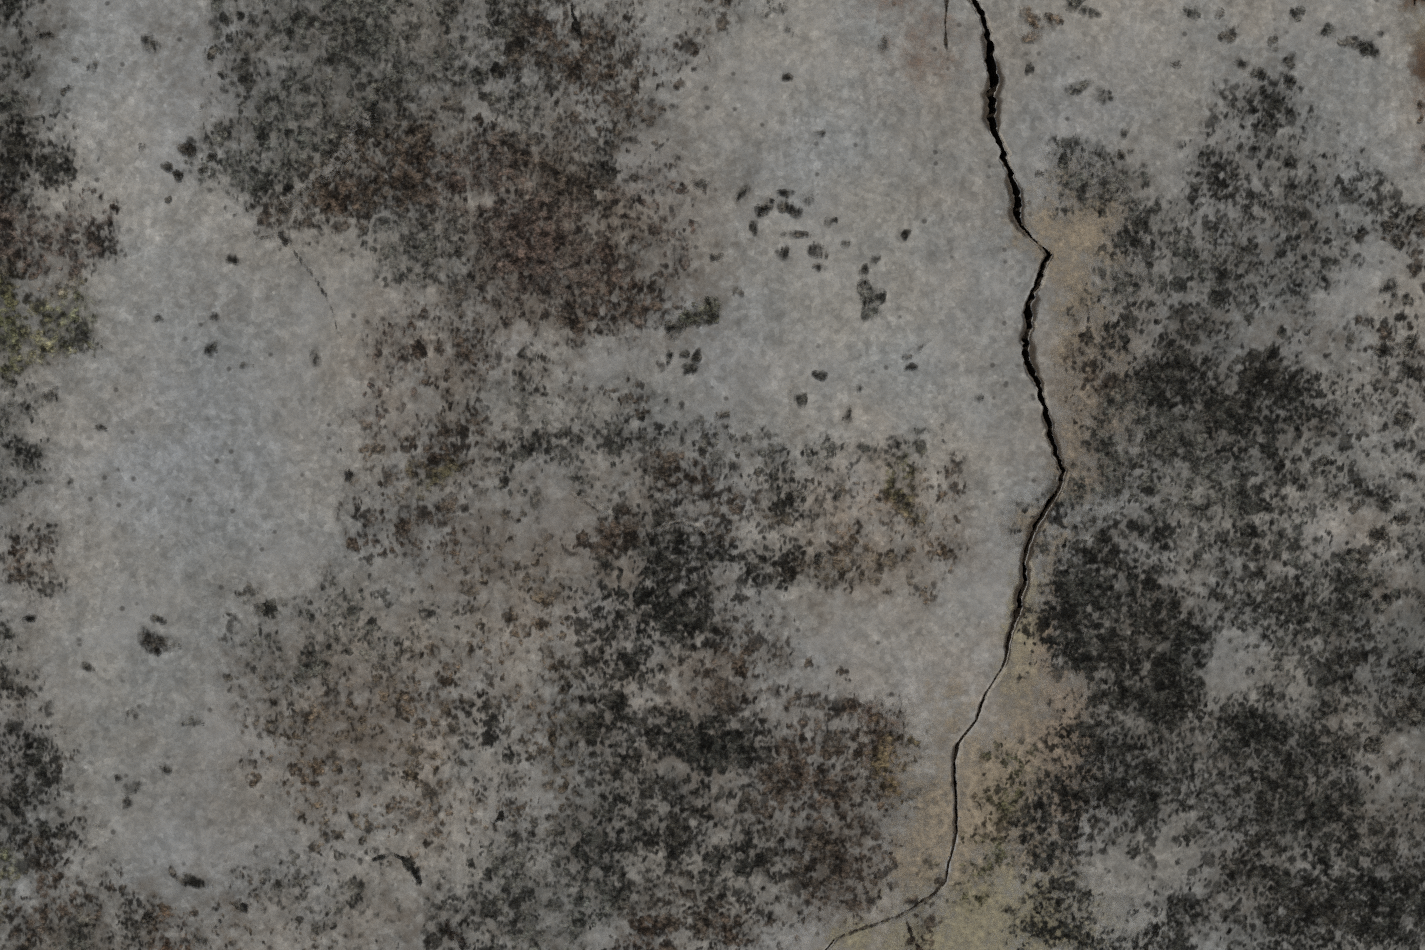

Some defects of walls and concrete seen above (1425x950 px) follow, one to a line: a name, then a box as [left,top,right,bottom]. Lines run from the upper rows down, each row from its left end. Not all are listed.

mould [1318,22,1384,56]
rust [1413,27,1425,86]
mould [0,0,126,279]
mould [160,161,184,180]
mould [737,185,850,270]
leakage [811,370,828,380]
mould [0,382,58,504]
crack [825,0,1069,950]
mould [0,513,67,621]
mould [234,583,287,620]
mould [0,609,213,950]
mould [229,850,366,950]